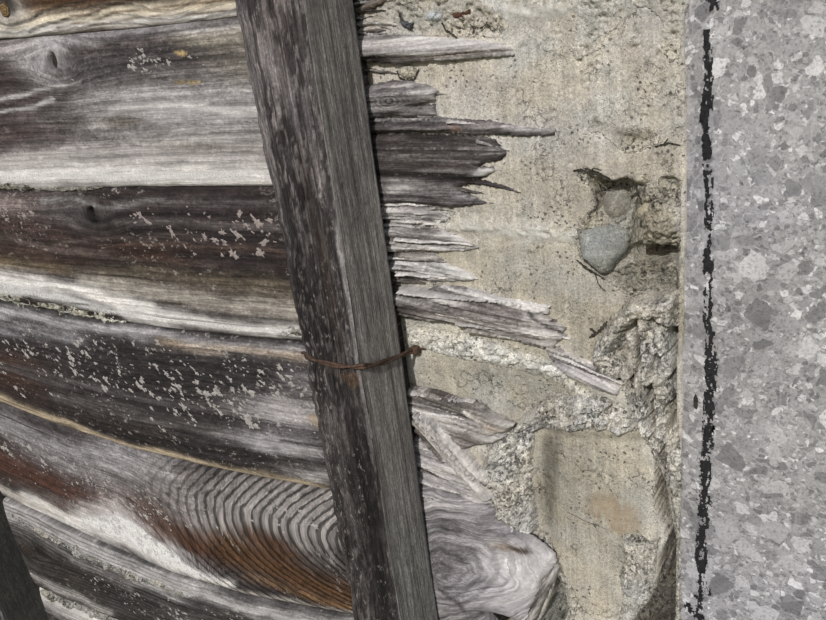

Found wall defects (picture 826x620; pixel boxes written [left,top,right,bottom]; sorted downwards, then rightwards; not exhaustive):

spalling [482,166,683,620]